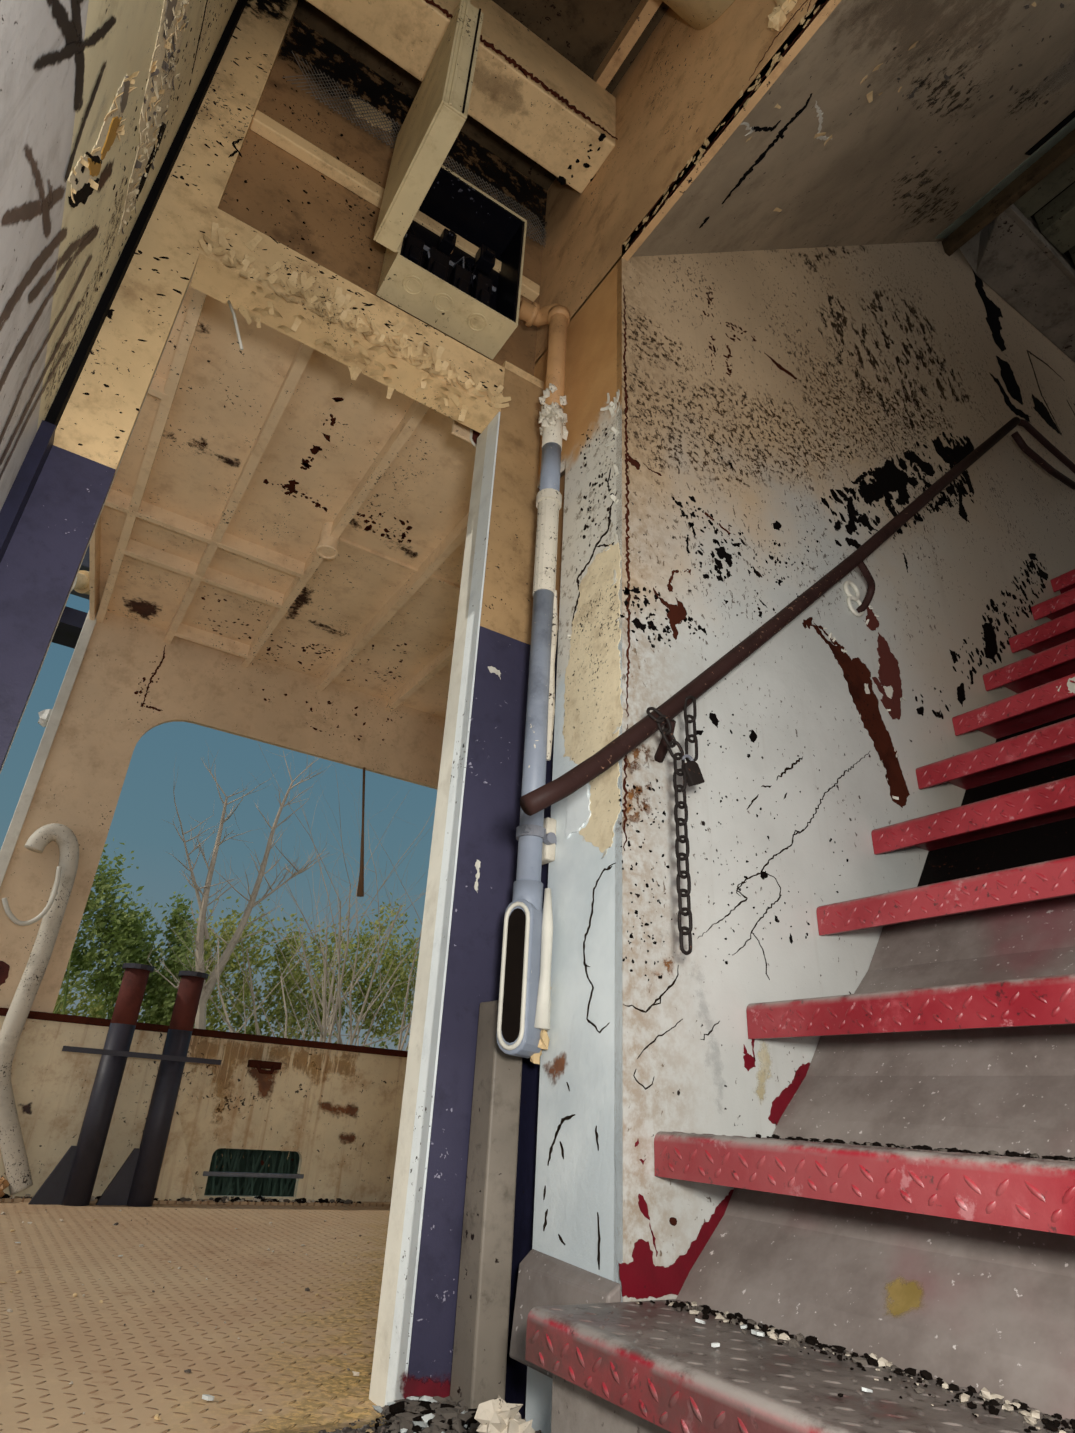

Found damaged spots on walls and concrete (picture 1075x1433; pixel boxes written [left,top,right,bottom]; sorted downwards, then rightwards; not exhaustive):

peeling [68,0,511,422]
crack [627,0,832,249]
spalling [672,432,974,618]
corrosion [0,961,10,985]
crack [583,751,870,1090]